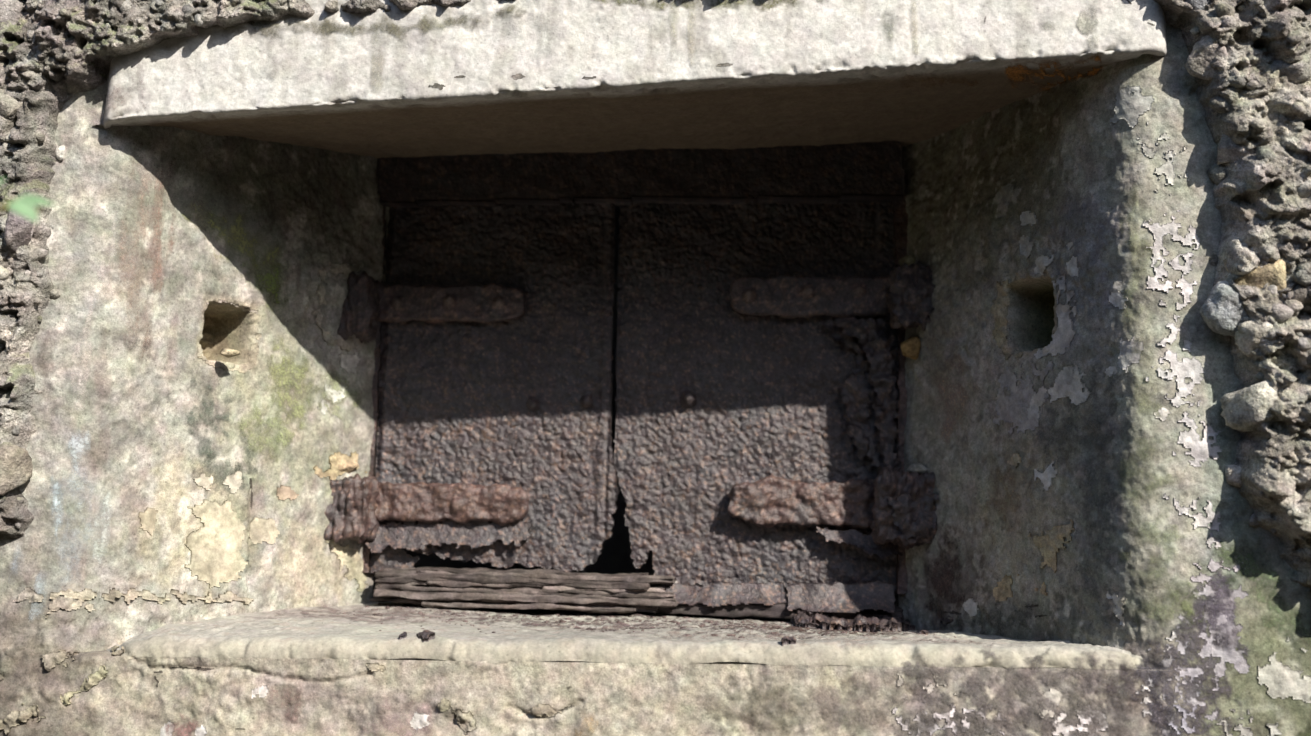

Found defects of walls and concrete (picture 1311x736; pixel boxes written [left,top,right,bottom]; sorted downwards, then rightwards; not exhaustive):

peeling [1110,85,1190,195]
spalling [990,211,1091,435]
peeling [1105,210,1221,467]
spalling [313,451,367,480]
peeling [1007,453,1057,491]
peeling [184,470,280,588]
spalling [326,540,368,592]
spalling [1028,519,1075,596]
spalling [963,598,979,617]